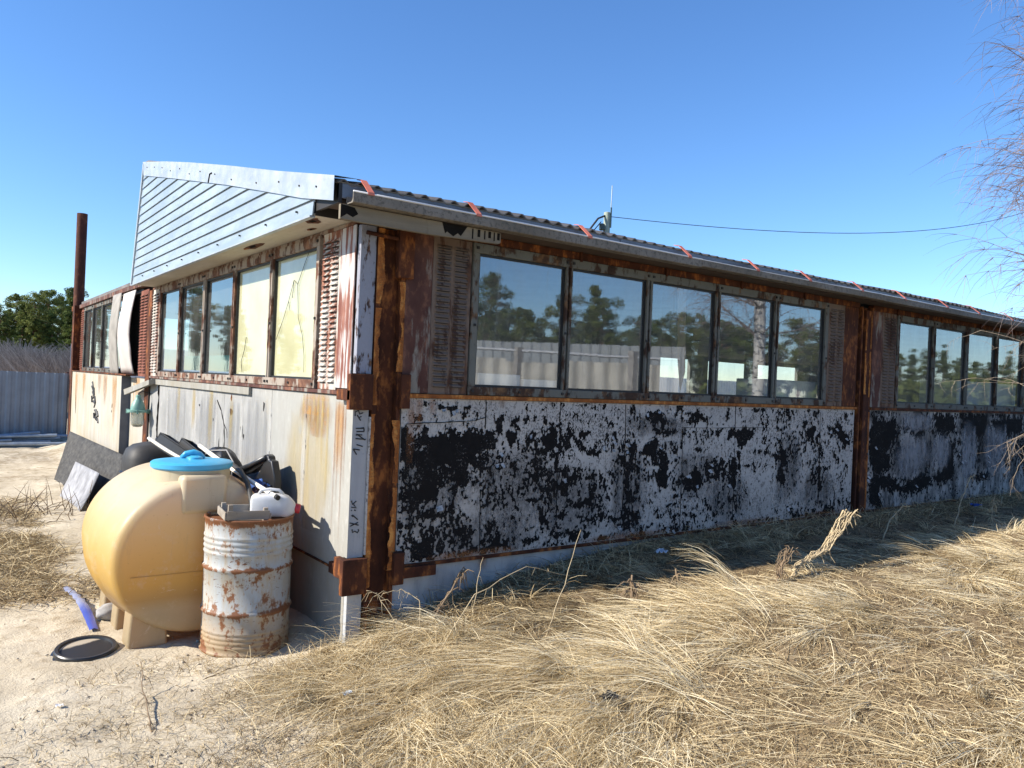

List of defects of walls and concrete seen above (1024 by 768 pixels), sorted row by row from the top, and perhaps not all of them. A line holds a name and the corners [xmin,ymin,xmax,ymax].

rust [365,228,386,588]
rust [387,420,400,570]
rust [396,282,406,372]
peeling [396,400,853,562]
rust [863,315,873,397]
peeling [867,411,1024,508]